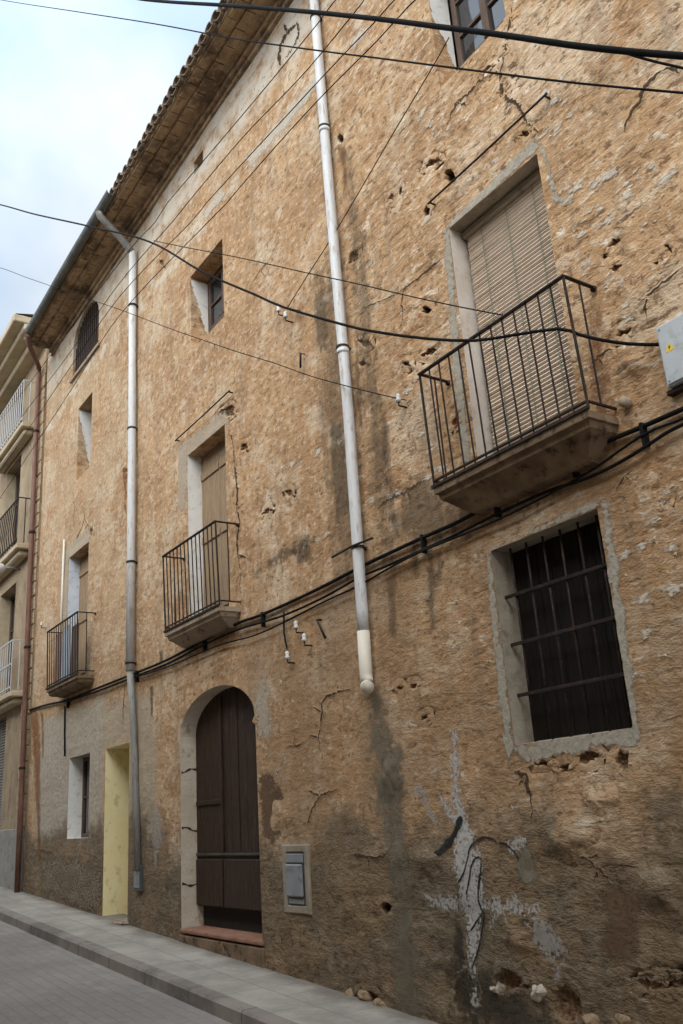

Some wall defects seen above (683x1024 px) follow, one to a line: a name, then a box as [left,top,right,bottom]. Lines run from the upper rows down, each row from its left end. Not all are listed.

crack [446,5,540,135]
crack [623,65,680,131]
crack [228,428,247,591]
spalling [258,483,296,520]
crack [286,687,350,751]
spalling [258,759,287,846]
crack [306,787,337,829]
crack [514,768,539,822]
spalling [526,743,639,783]